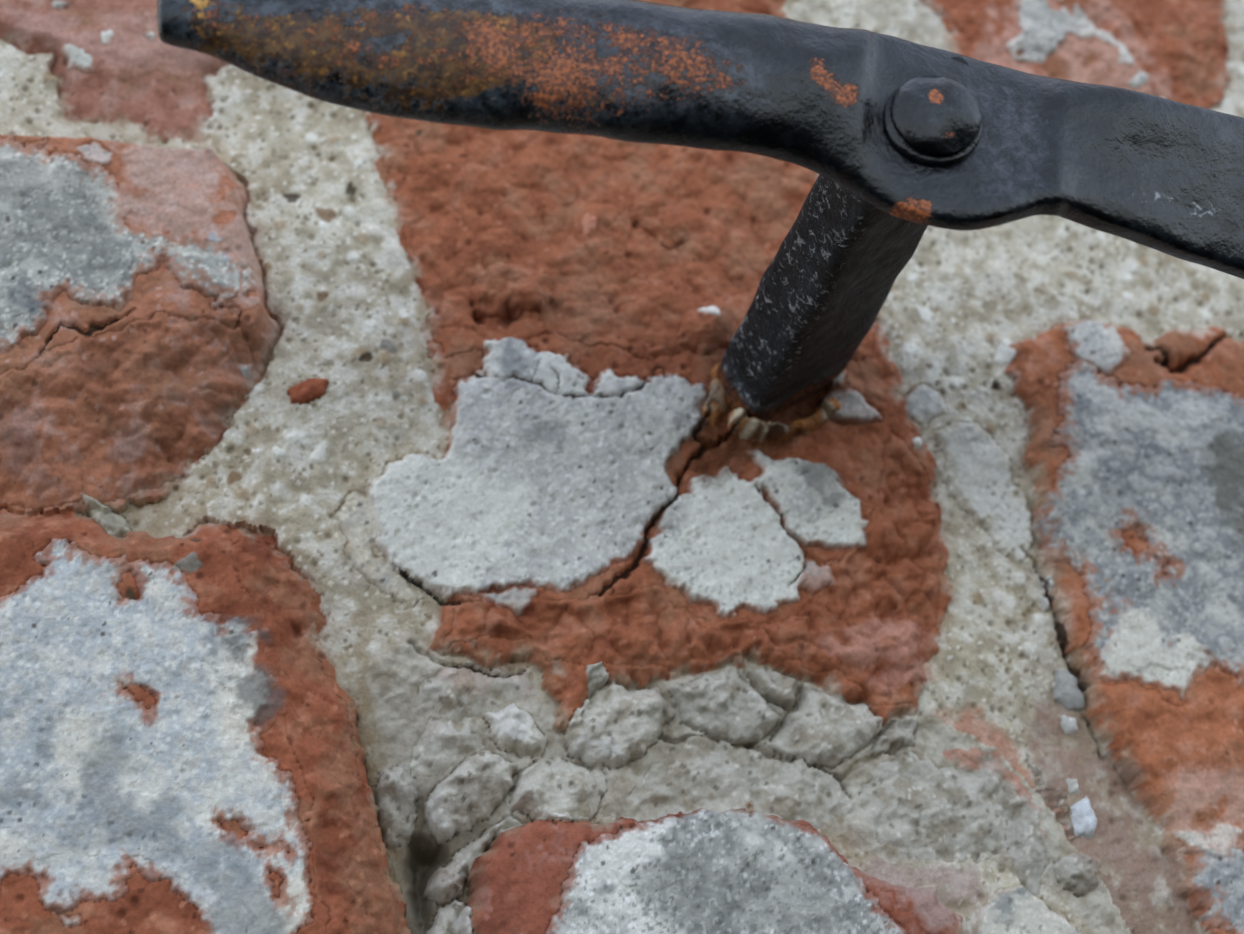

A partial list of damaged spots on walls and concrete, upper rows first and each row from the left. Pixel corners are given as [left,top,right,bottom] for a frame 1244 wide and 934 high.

spalling [640,0,761,14]
spalling [922,0,999,42]
spalling [1112,0,1220,100]
peeling [75,142,114,167]
spalling [366,112,819,361]
spalling [0,312,262,514]
crack [598,409,748,597]
crack [439,661,526,679]
spalling [230,430,1131,934]
crack [746,676,886,769]
crack [1021,546,1101,757]
spalling [1082,667,1244,798]